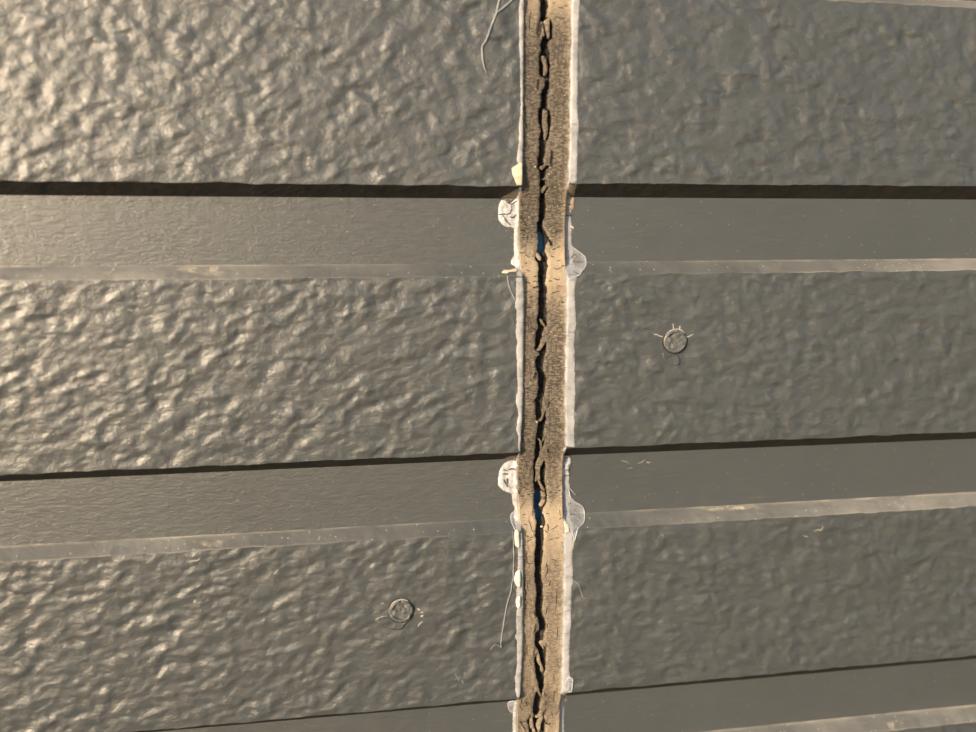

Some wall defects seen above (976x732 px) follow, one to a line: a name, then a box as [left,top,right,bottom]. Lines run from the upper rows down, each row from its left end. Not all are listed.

crack [498,0,585,732]